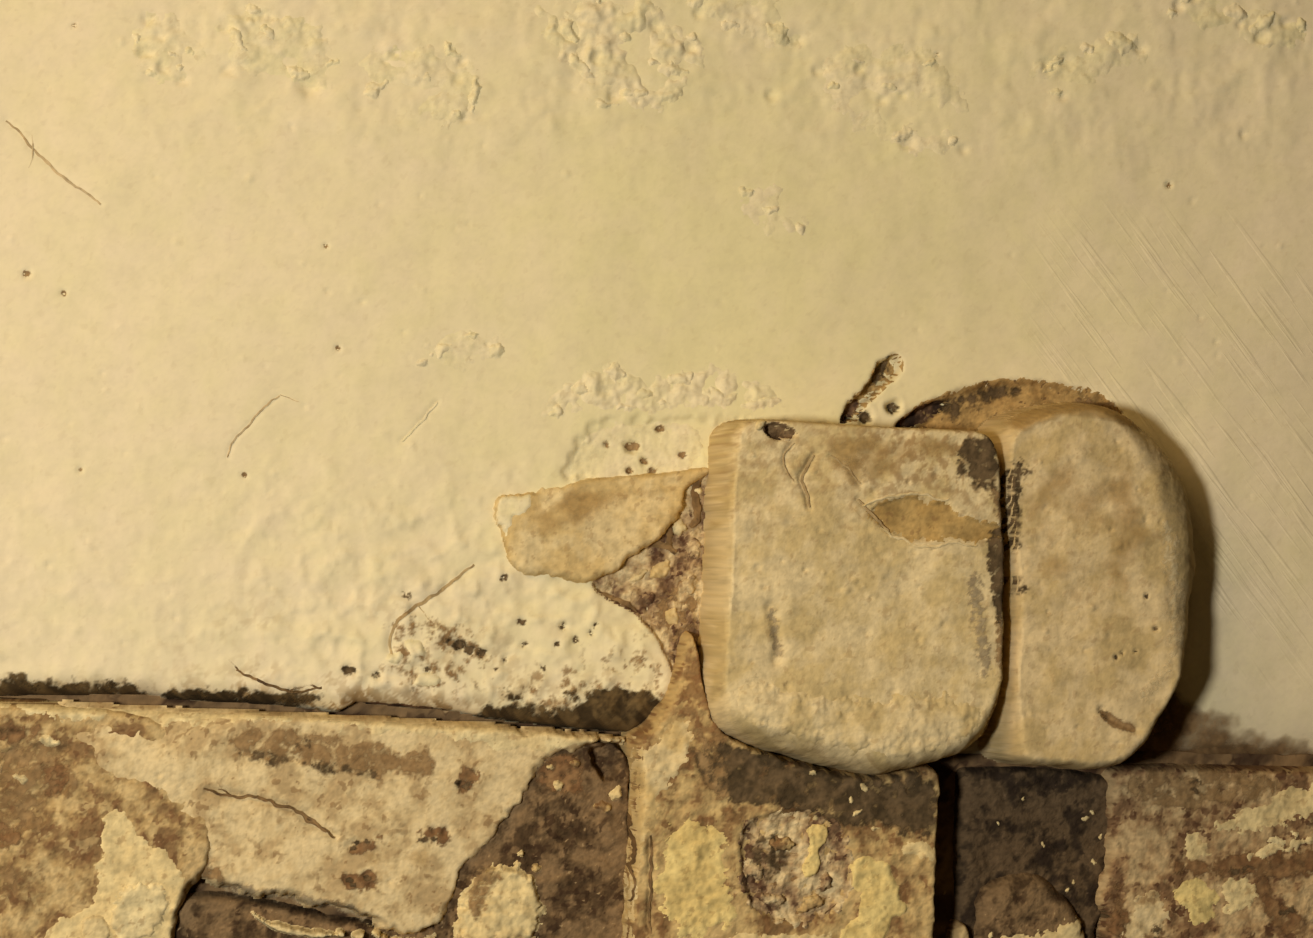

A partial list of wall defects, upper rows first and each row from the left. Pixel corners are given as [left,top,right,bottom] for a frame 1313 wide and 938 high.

water stain [998,403,1139,429]
flaking render [494,494,531,541]
flaking render [541,361,781,672]